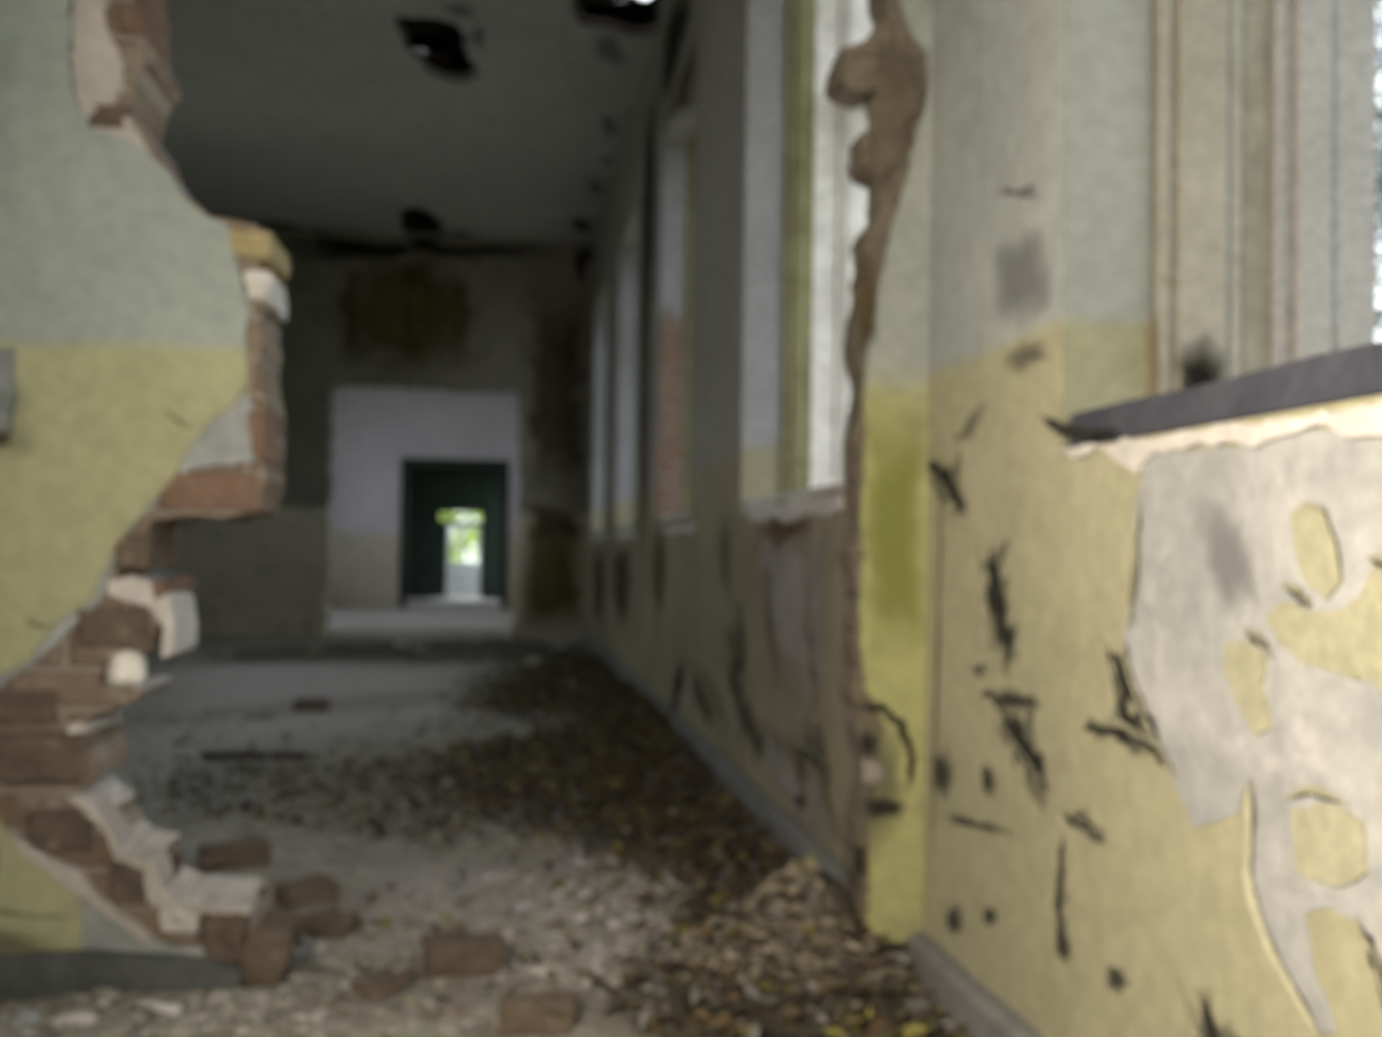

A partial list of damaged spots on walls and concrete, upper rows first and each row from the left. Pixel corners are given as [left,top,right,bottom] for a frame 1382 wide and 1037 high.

flaking render [88,103,147,131]
flaking render [849,45,921,219]
flaking render [230,229,291,321]
flaking render [158,408,286,516]
flaking render [75,535,196,649]
flaking render [739,495,844,695]
flaking render [0,689,122,782]
flaking render [860,732,900,816]
flaking render [863,703,916,783]
peeling [1054,402,1382,1037]
flaking render [27,808,94,852]
flaking render [110,837,363,962]